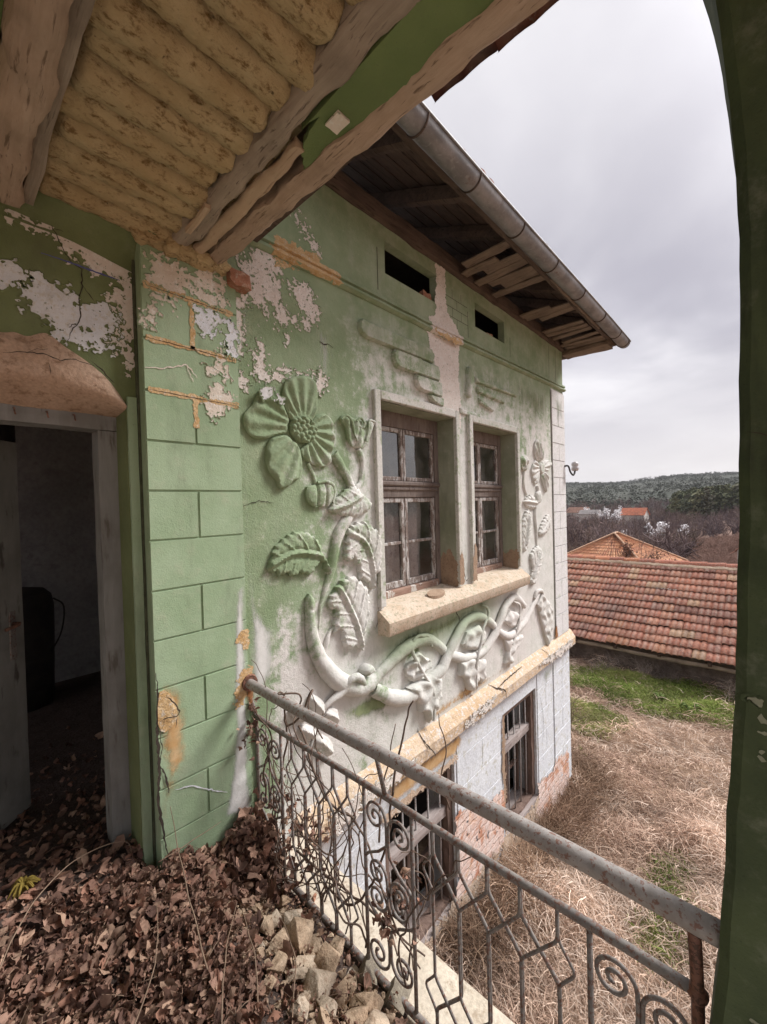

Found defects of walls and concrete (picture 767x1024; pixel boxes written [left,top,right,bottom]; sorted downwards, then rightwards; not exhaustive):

crack [3,227,113,382]
peeling [0,205,343,425]
spalling [427,263,464,428]
crack [155,673,224,854]
spalling [235,629,250,650]
spalling [233,665,253,710]
crack [490,666,522,698]
spalling [424,831,521,952]